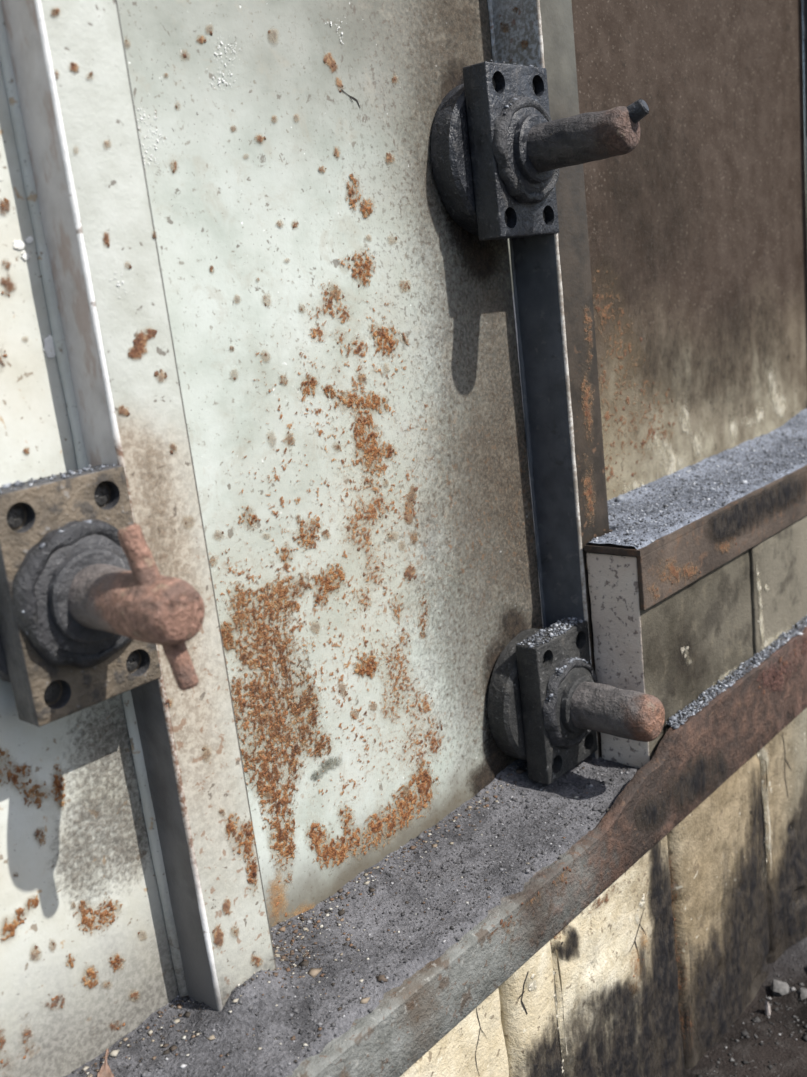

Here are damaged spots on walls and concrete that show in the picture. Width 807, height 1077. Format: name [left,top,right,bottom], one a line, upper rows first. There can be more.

rust [323,53,343,92]
rust [0,198,10,214]
rust [345,172,374,218]
rust [1,260,15,297]
rust [128,328,157,359]
rust [582,270,681,494]
rust [209,234,444,917]
rust [0,748,67,809]
rust [1,895,40,942]
rust [71,897,123,934]
rust [82,955,125,989]
rust [46,995,65,1009]